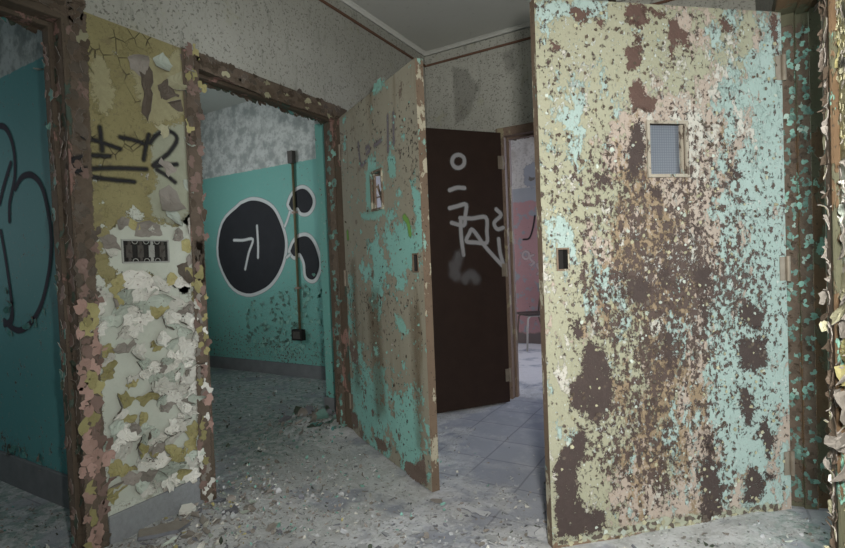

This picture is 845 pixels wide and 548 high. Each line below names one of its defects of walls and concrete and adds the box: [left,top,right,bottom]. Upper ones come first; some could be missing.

peeling [31,0,347,548]
peeling [525,340,781,547]
peeling [781,0,845,548]